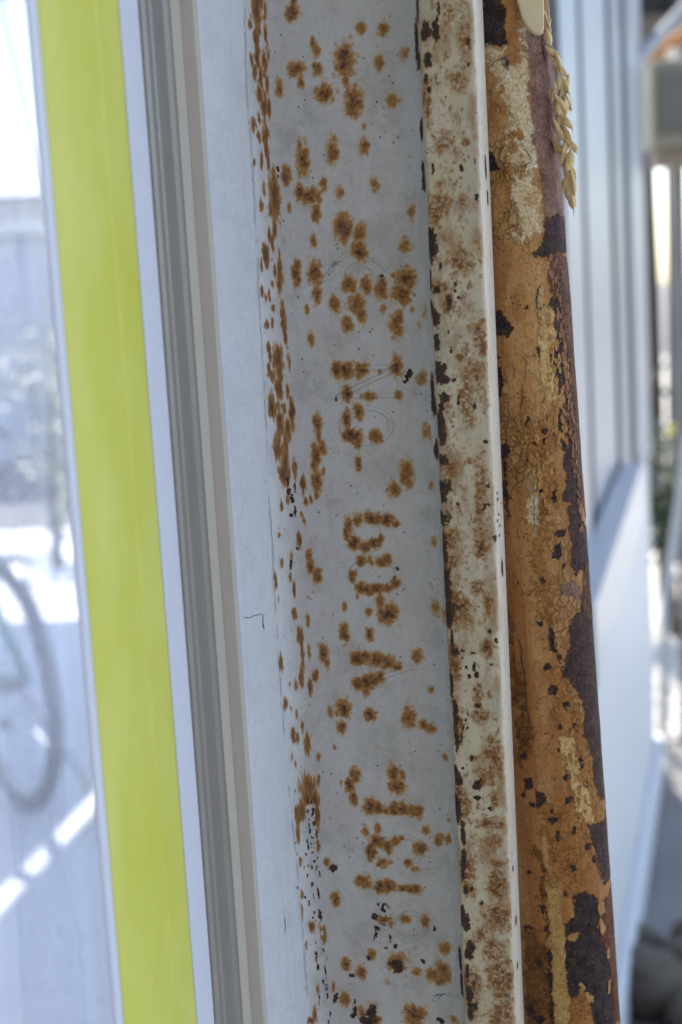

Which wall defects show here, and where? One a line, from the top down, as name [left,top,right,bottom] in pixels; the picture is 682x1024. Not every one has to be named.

peeling [459,0,589,577]
rust [246,0,606,1024]
peeling [521,604,611,885]
peeling [516,870,615,1024]
rust [598,887,620,1024]